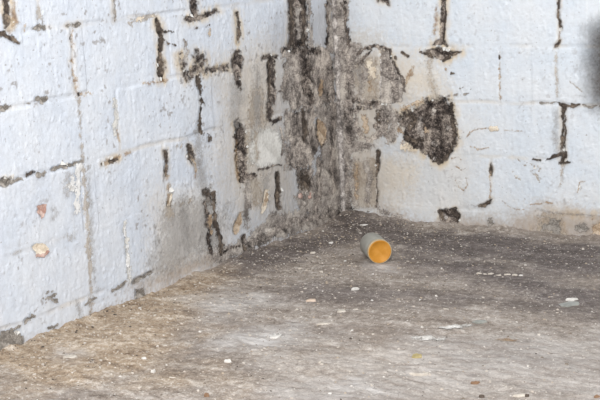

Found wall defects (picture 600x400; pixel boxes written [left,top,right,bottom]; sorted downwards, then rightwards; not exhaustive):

spalling [185,0,218,36]
spalling [356,44,474,165]
leakage [202,0,412,266]
peeling [0,160,84,214]
spalling [233,119,257,235]
spalling [437,207,461,223]
peeling [32,243,49,258]